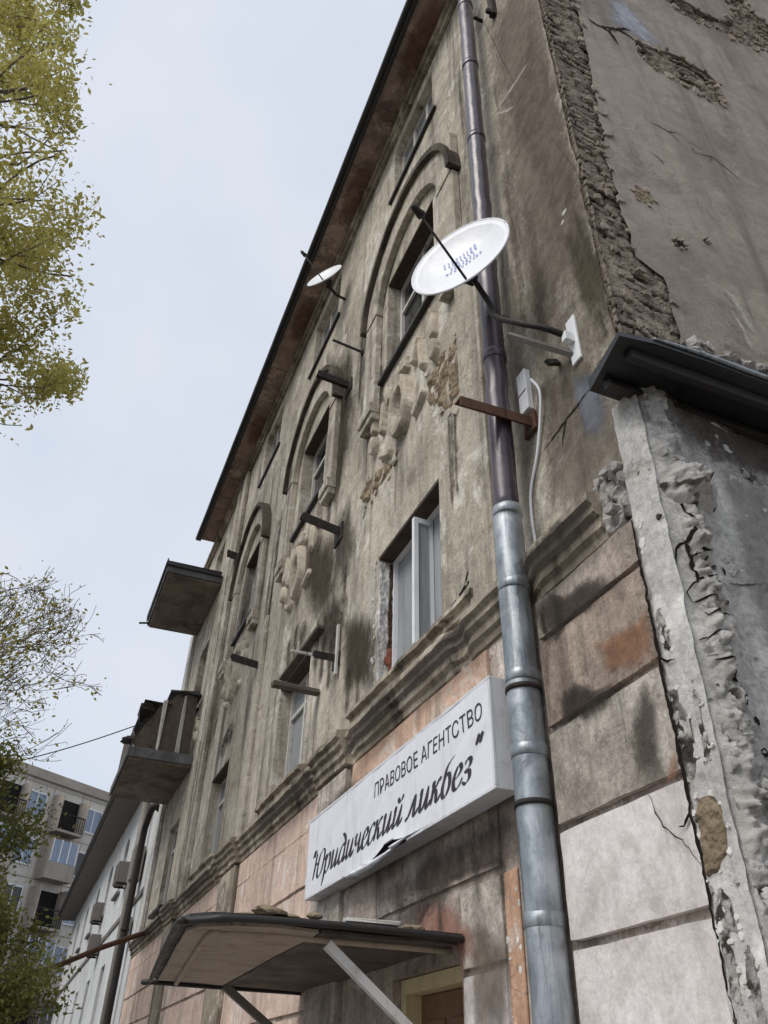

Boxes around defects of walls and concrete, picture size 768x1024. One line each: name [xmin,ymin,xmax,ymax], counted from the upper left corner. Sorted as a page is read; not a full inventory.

crack [589,19,647,48]
spalling [538,0,768,375]
spalling [423,332,460,417]
water stain [282,143,461,708]
crack [542,394,585,453]
spalling [360,450,399,518]
peeling [655,607,675,652]
water stain [632,691,656,770]
crack [631,520,735,1018]
peeling [666,679,767,1024]